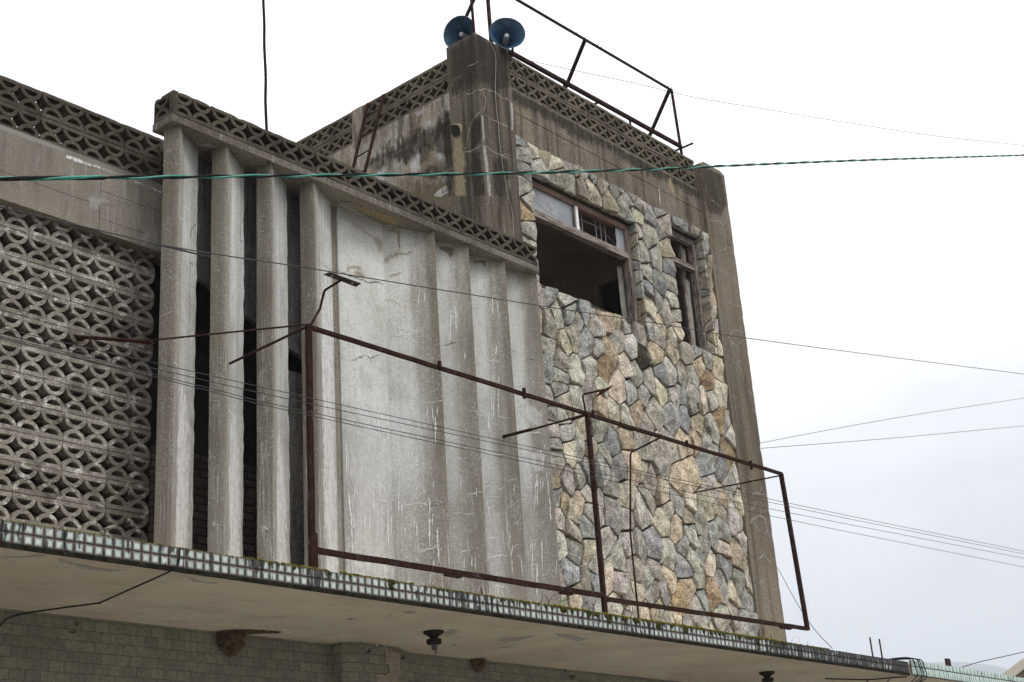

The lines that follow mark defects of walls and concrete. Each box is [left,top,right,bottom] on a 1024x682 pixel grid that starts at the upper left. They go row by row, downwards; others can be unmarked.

leakage [377,110,509,211]
crack [450,61,576,167]
leakage [450,36,726,215]
leakage [320,275,440,579]
crack [379,479,547,576]
leakage [510,534,543,594]
leakage [525,445,551,519]